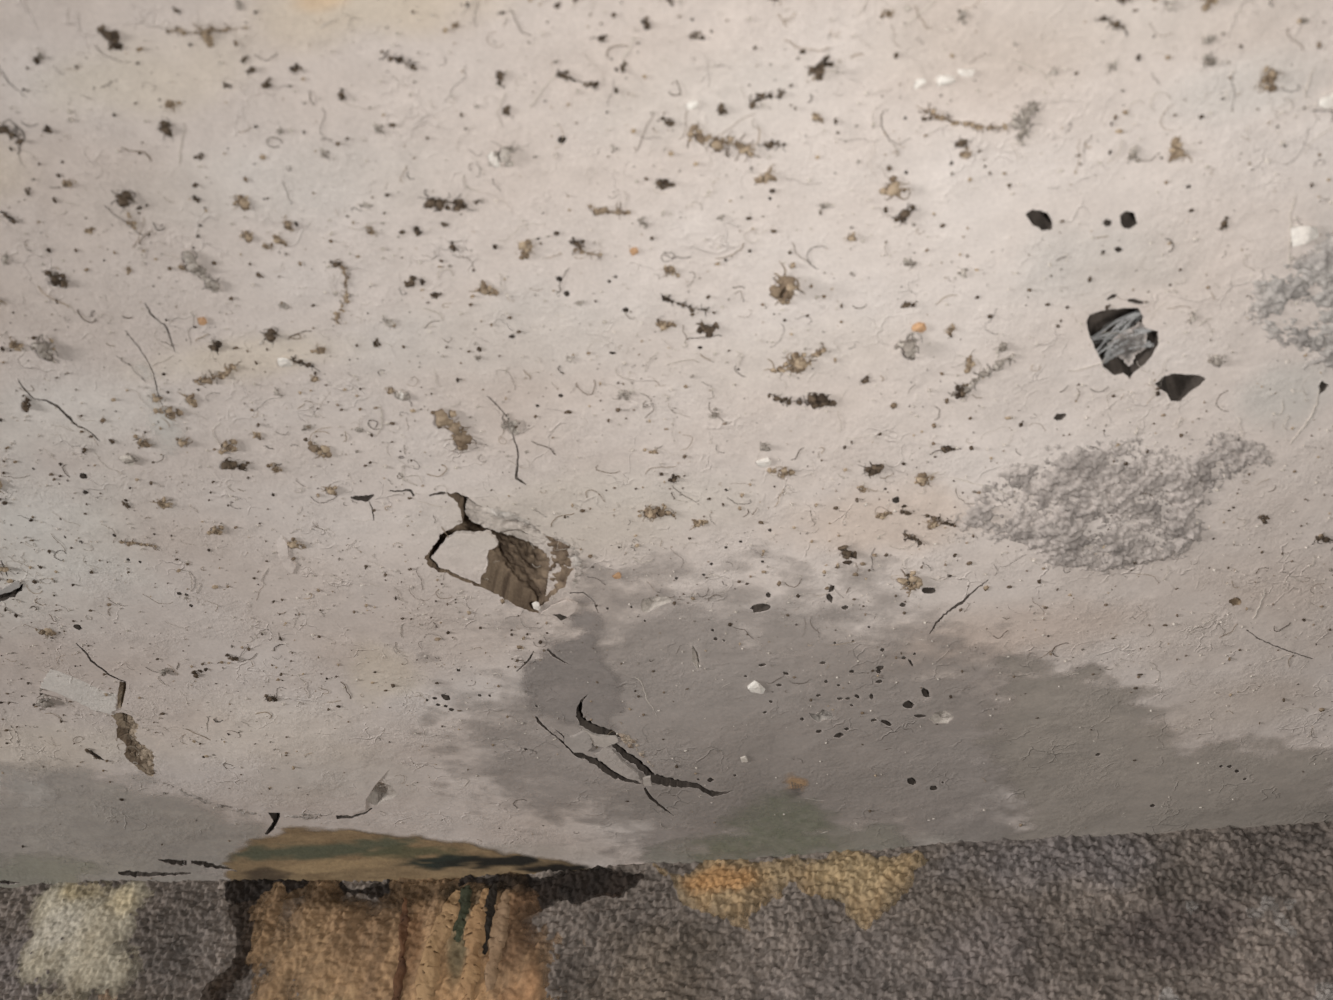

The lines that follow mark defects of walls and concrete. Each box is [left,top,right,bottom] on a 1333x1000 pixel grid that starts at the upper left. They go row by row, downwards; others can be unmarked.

spalling [1318,93,1333,109]
spalling [1086,294,1158,377]
spalling [1155,373,1206,401]
peeling [1242,225,1333,394]
spalling [389,489,609,621]
peeling [950,431,1273,576]
crack [517,648,569,671]
crack [535,694,731,816]
damp [477,591,1333,850]
damp [0,769,587,1000]